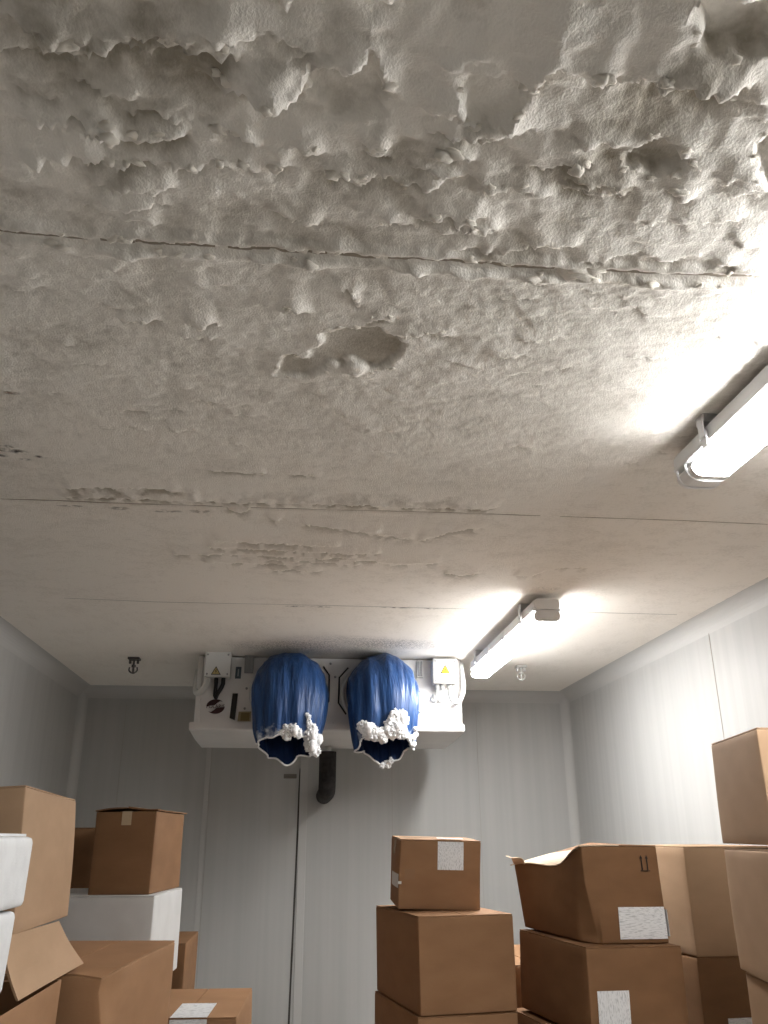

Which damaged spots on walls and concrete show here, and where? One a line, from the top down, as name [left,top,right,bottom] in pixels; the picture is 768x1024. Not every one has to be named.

peeling [56,39,80,52]
spalling [685,0,768,71]
spalling [301,36,399,124]
spalling [452,69,546,136]
peeling [97,120,146,168]
peeling [434,147,465,163]
peeling [567,159,591,178]
spalling [617,132,698,182]
spalling [748,128,768,193]
crack [0,219,768,291]
spalling [271,316,410,380]